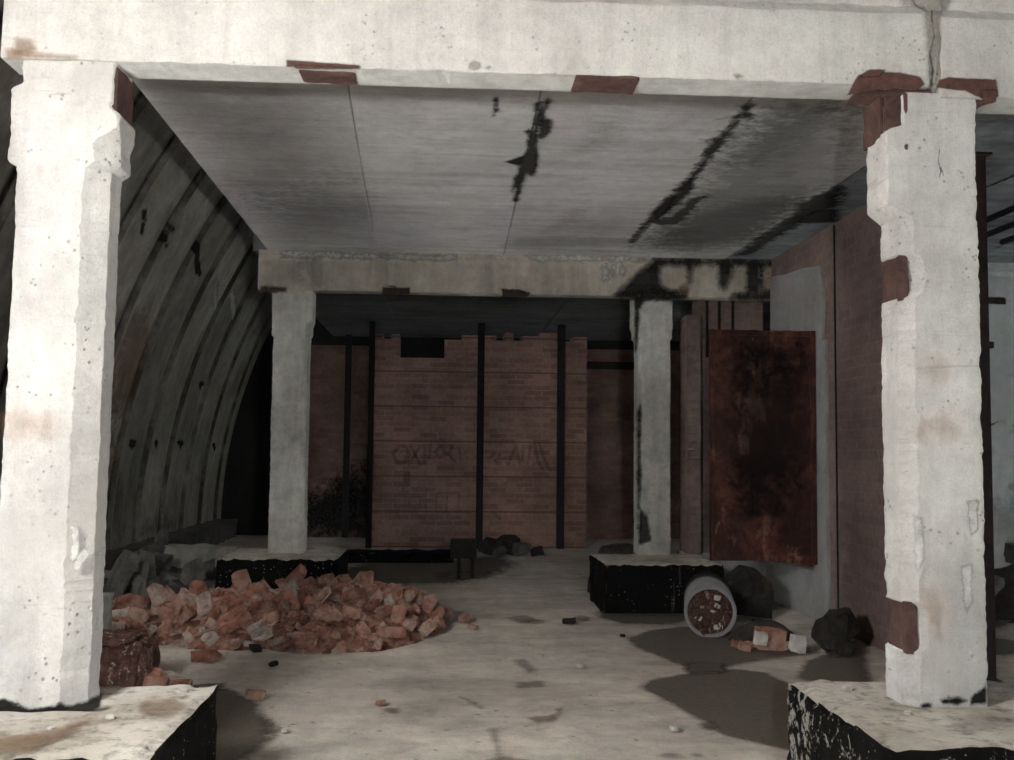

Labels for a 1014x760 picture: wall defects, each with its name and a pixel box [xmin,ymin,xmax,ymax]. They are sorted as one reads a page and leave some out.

crack [912,0,934,89]
leakage [506,99,552,202]
leakage [630,104,754,243]